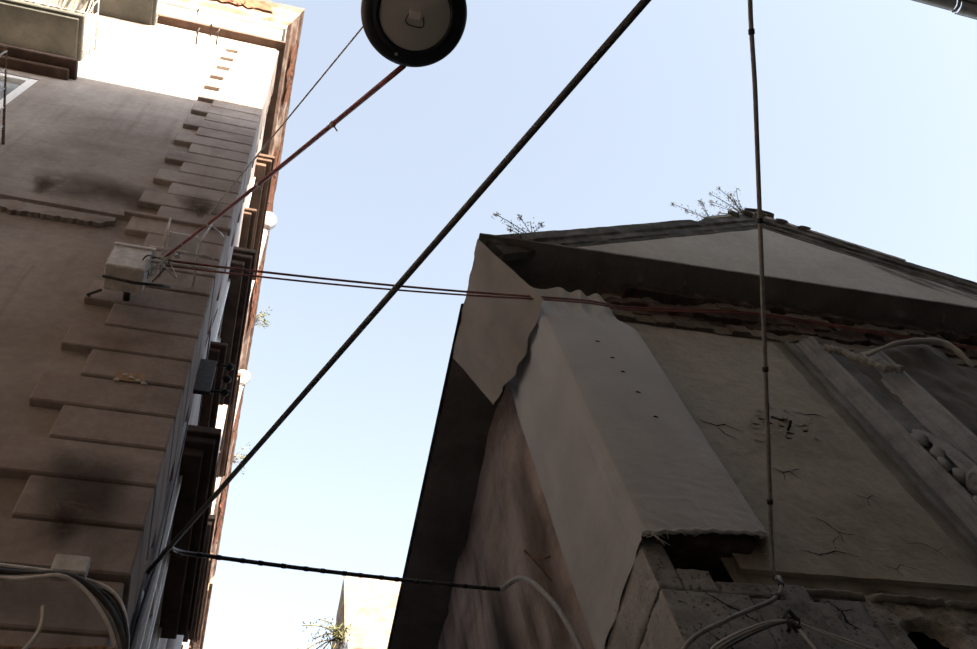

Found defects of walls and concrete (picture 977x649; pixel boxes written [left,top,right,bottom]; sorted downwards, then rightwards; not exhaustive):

spalling [857,595,977,649]